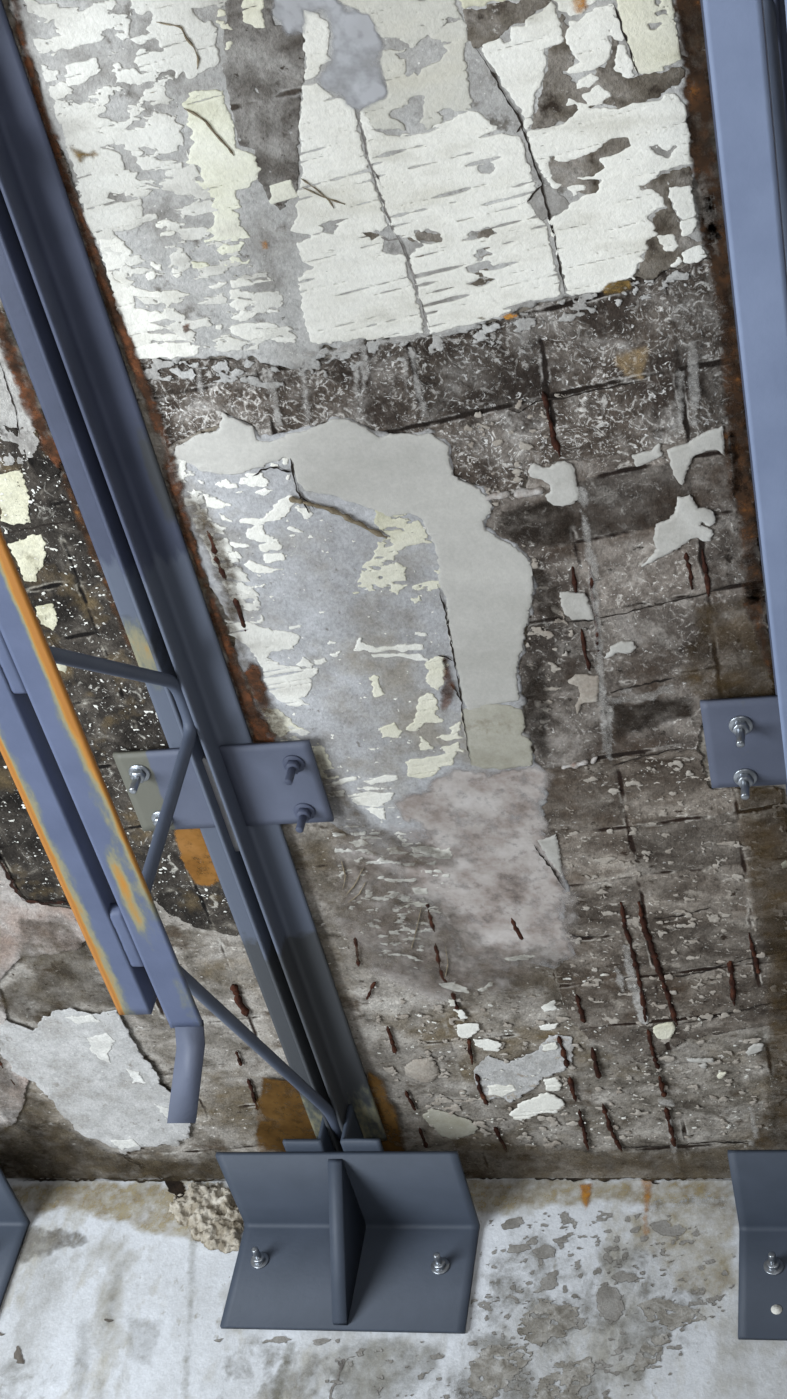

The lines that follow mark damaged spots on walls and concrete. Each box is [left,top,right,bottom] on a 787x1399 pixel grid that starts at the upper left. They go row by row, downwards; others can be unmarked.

crack [354,108,430,327]
crack [477,50,565,291]
rust [0,0,275,743]
rust [673,0,773,699]
spalling [24,0,787,1152]
rust [440,658,454,710]
spalling [0,752,70,906]
rust [256,1077,316,1152]
rust [367,1073,405,1151]